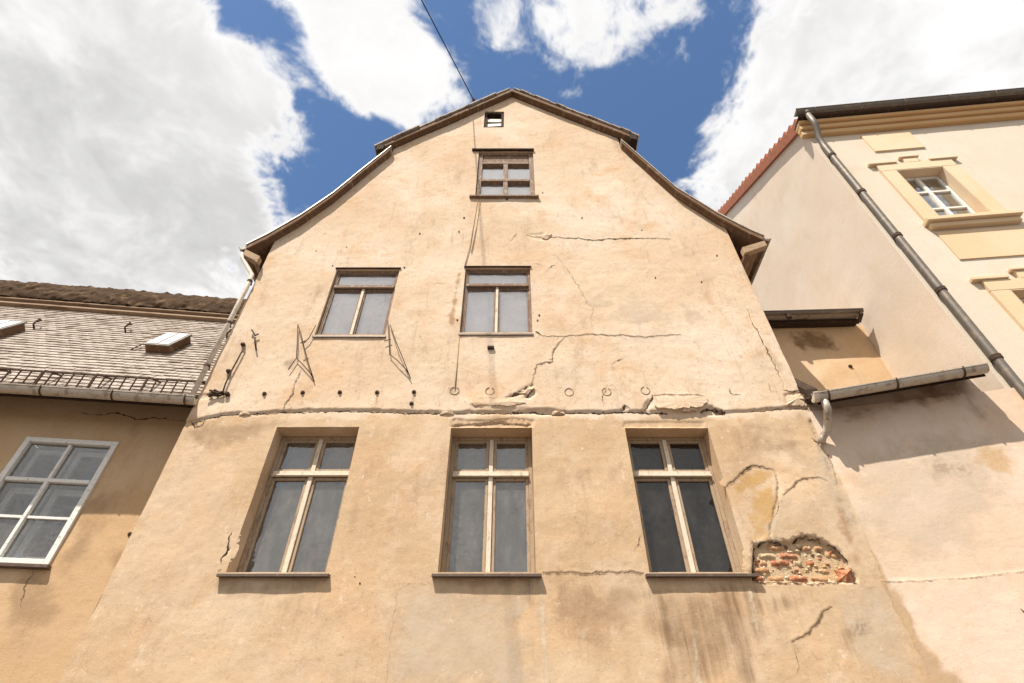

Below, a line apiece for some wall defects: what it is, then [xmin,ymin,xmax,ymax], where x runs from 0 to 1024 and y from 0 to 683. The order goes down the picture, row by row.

crack [509,232,681,384]
leakage [794,332,833,349]
crack [72,370,725,428]
flaking render [451,383,535,427]
crack [719,303,837,537]
flaking render [741,523,854,582]
crack [787,604,833,671]